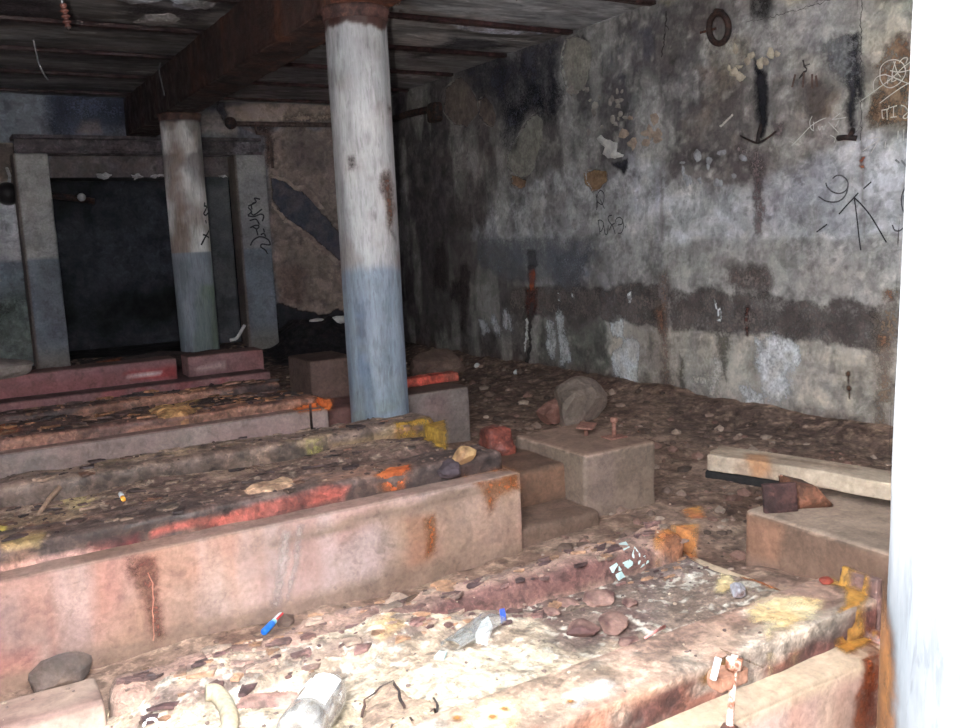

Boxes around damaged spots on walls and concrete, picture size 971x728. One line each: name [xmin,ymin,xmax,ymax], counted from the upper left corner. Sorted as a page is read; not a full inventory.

spalling [560,35,663,159]
spalling [270,175,340,263]
corrosion [380,172,395,232]
spalling [506,113,544,190]
spalling [583,168,608,193]
corrosion [525,250,538,321]
damp [478,238,879,404]
corrosion [478,470,519,510]
corrosion [424,515,436,554]
corrosion [129,557,163,641]
corrosion [832,565,894,728]